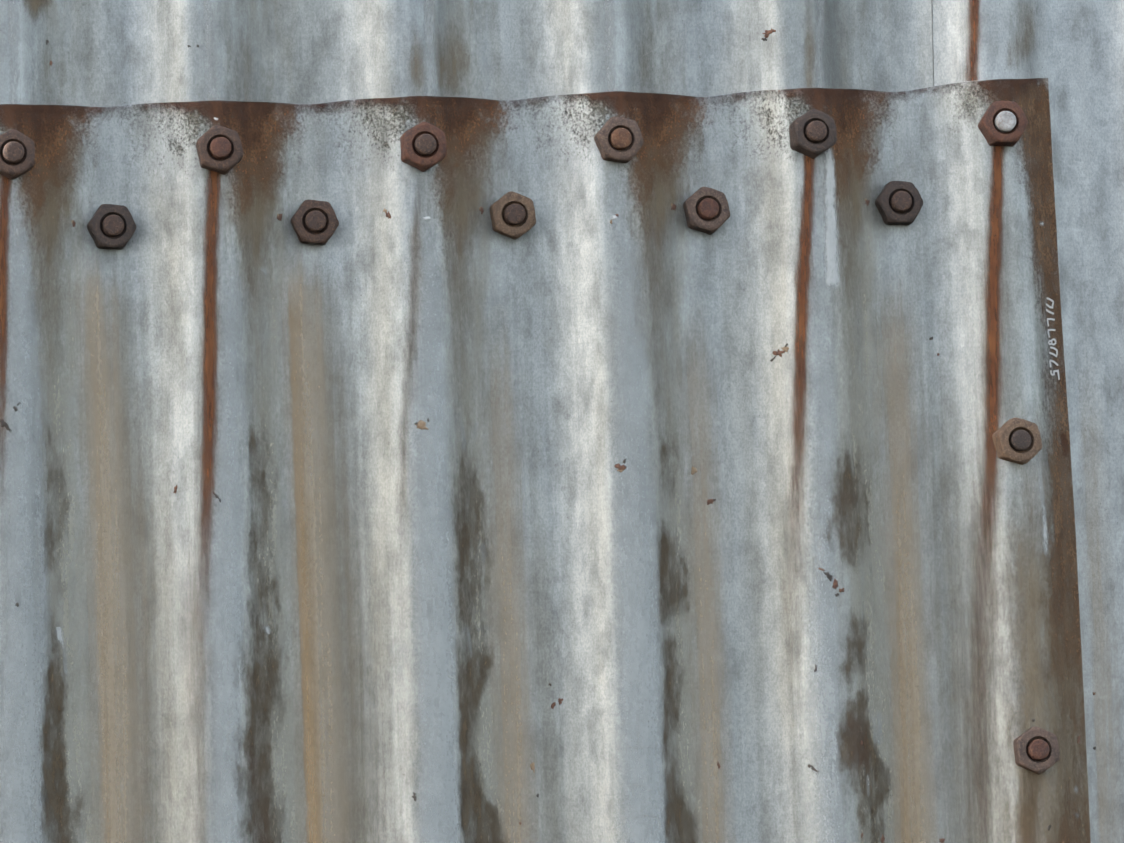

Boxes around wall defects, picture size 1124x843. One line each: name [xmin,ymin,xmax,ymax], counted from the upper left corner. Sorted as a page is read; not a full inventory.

damp [0,232,99,843]
rust [0,104,109,416]
damp [214,263,300,843]
rust [143,96,530,527]
damp [414,246,505,843]
rust [567,91,705,251]
damp [613,263,703,843]
rust [794,155,814,453]
rust [781,84,954,252]
damp [844,198,896,843]
rust [960,0,1091,843]